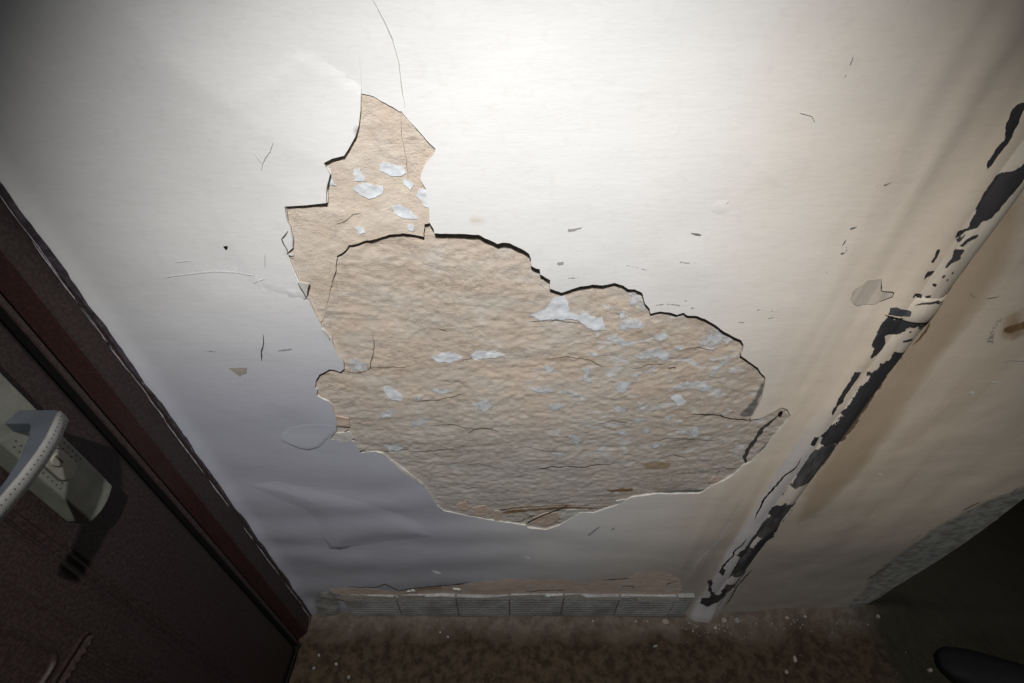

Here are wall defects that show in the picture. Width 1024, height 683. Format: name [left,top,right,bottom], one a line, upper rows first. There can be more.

crack [373,0,405,107]
spalling [281,94,790,529]
peeling [700,278,928,607]
peeling [913,103,1024,298]